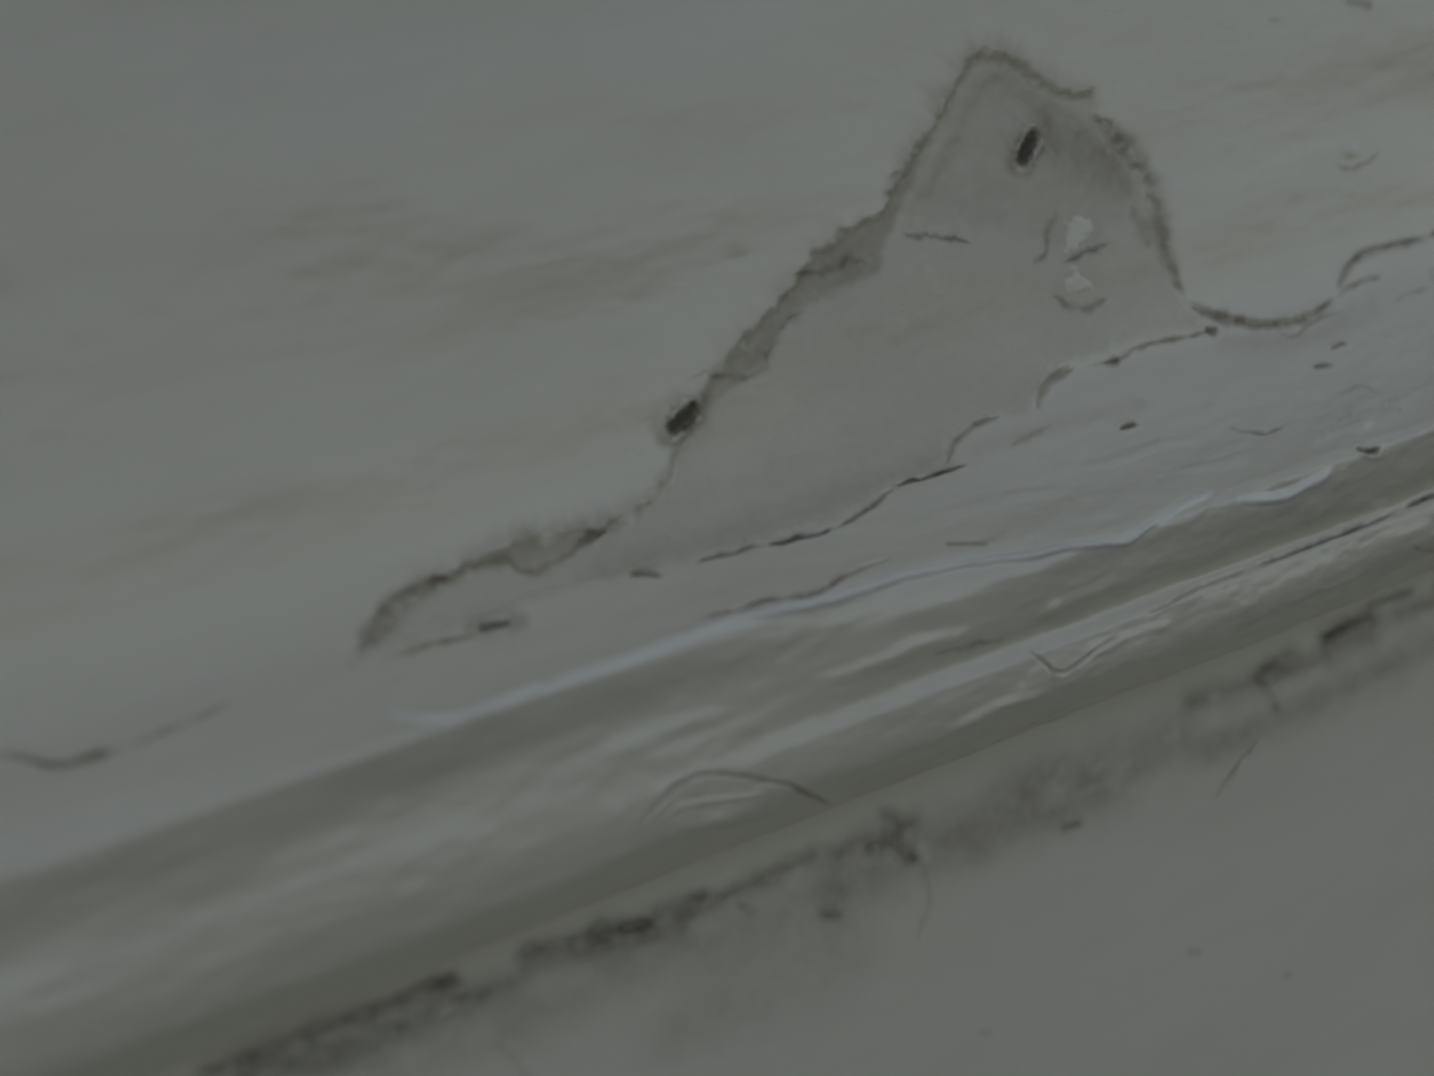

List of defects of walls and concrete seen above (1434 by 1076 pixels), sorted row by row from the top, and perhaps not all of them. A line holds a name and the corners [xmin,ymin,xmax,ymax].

crack [1194,302,1328,336]
crack [700,465,964,562]
peeling [1236,466,1335,510]
crack [1409,496,1434,506]
peeling [388,489,1213,725]